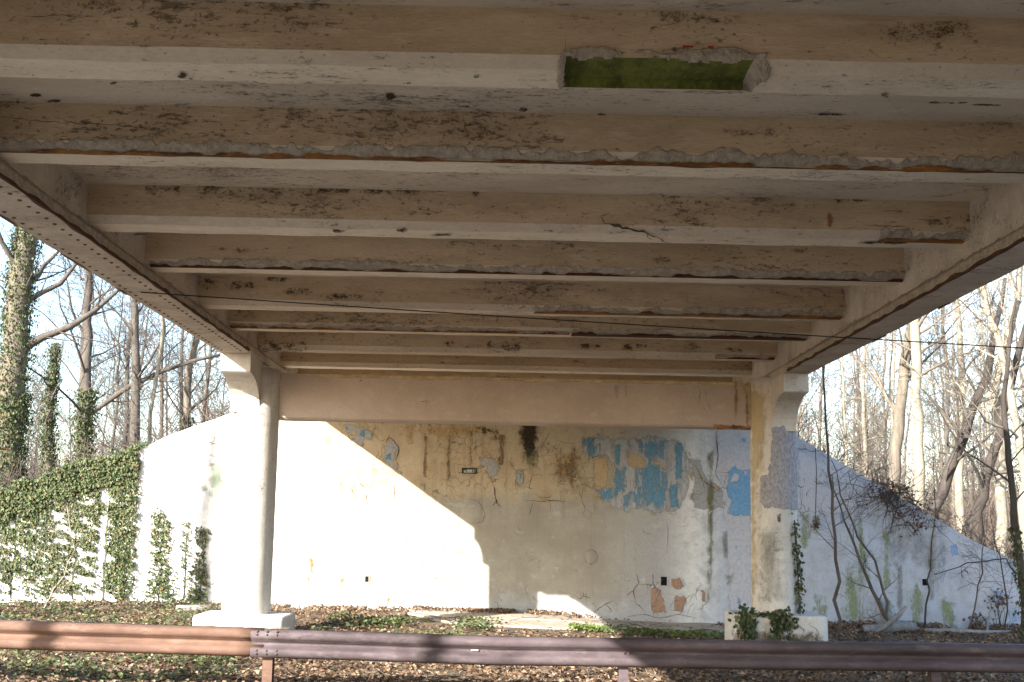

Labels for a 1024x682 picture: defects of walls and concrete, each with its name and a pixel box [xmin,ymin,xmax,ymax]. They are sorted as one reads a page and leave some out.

spalling [556,45,771,95]
spalling [0,135,1024,371]
crack [602,218,673,244]
peeling [338,423,402,474]
water stain [519,426,538,465]
crack [472,434,599,523]
peeling [581,425,932,616]
crack [580,574,708,618]
water stain [943,600,954,624]